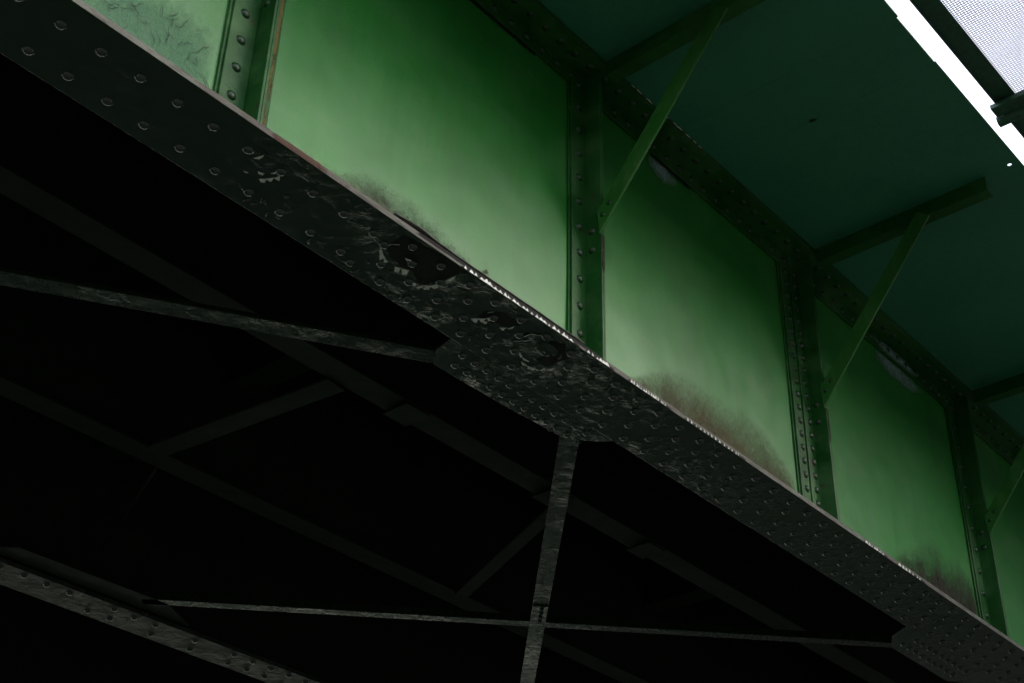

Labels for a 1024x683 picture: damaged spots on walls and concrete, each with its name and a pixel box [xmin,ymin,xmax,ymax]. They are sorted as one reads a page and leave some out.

peeling [244,146,285,185]
peeling [379,235,614,370]